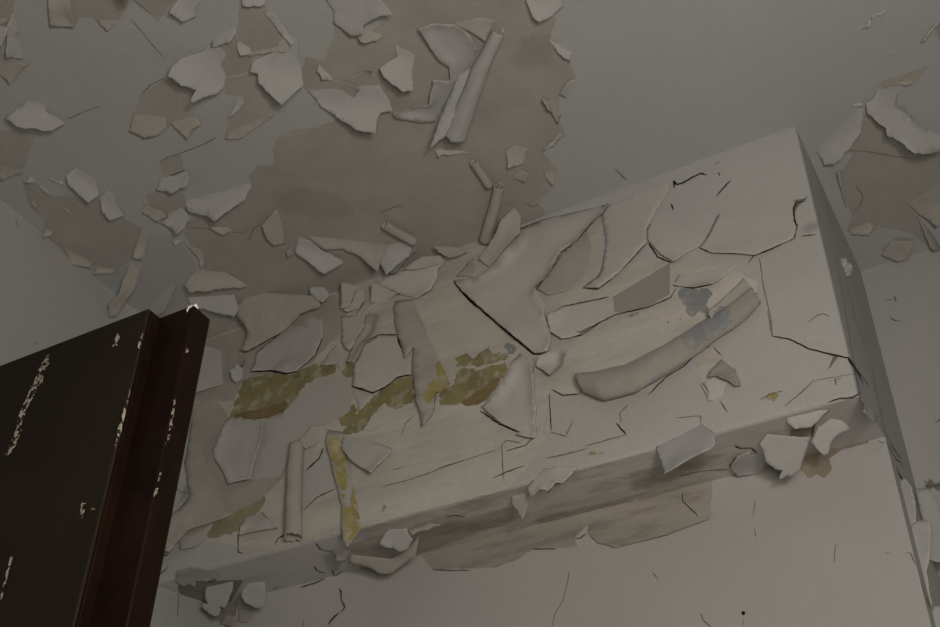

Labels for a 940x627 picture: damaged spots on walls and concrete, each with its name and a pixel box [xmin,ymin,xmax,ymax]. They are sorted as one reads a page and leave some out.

peeling [0,0,31,85]
peeling [0,101,65,180]
peeling [21,0,578,318]
peeling [816,89,940,252]
peeling [5,355,49,455]
peeling [165,182,868,575]
peeling [879,434,940,627]
crack [924,480,940,490]